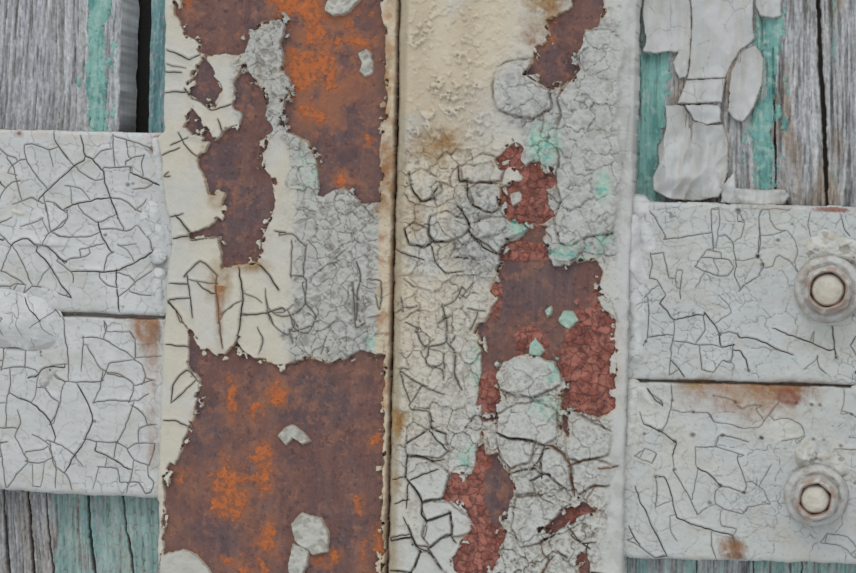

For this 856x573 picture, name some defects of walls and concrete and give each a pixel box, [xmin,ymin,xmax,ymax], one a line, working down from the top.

crack [165,50,231,131]
peeling [172,0,399,268]
peeling [522,0,606,91]
peeling [642,0,791,205]
peeling [160,329,393,573]
crack [333,166,501,573]
peeling [443,143,619,573]
crack [497,0,856,573]